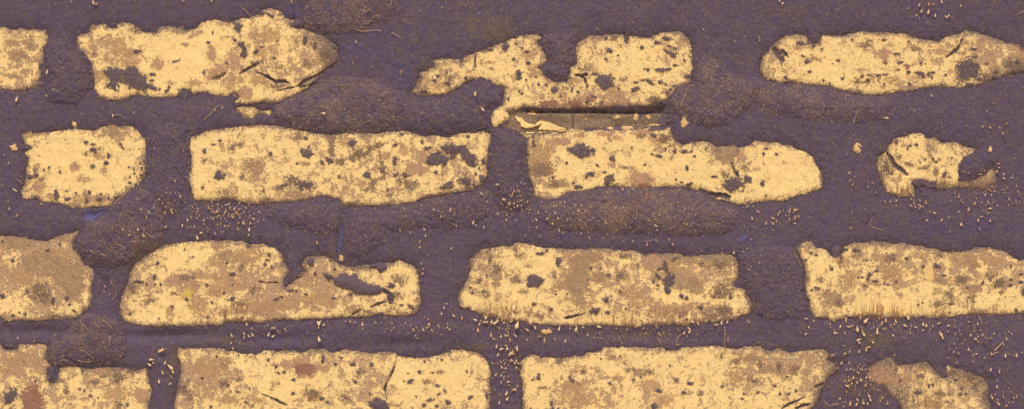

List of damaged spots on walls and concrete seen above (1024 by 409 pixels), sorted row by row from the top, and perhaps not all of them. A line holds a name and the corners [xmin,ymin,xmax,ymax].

crack [213,59,342,92]